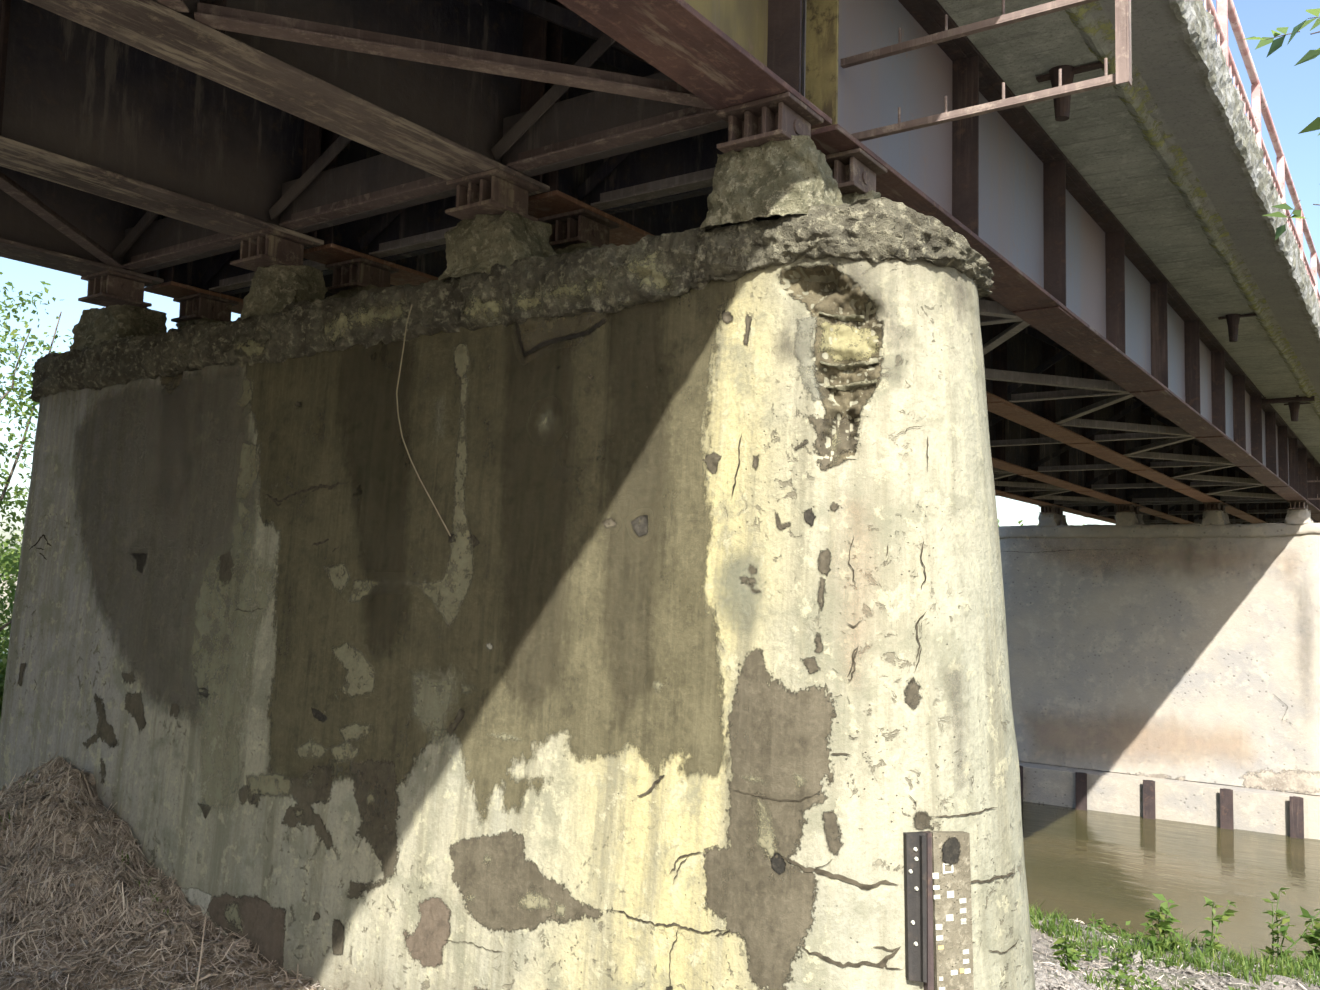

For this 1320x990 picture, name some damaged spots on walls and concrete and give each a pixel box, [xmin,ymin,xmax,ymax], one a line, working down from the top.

spalling [778,263,885,471]
damp [76,251,837,990]
peeling [800,632,823,674]
peeling [822,810,844,855]
peeling [403,829,613,967]
crack [669,852,703,879]
peeling [770,852,786,875]
crack [781,857,897,890]
crack [971,872,1015,883]
peeling [181,888,287,970]
crack [613,910,729,988]
crack [804,946,903,970]